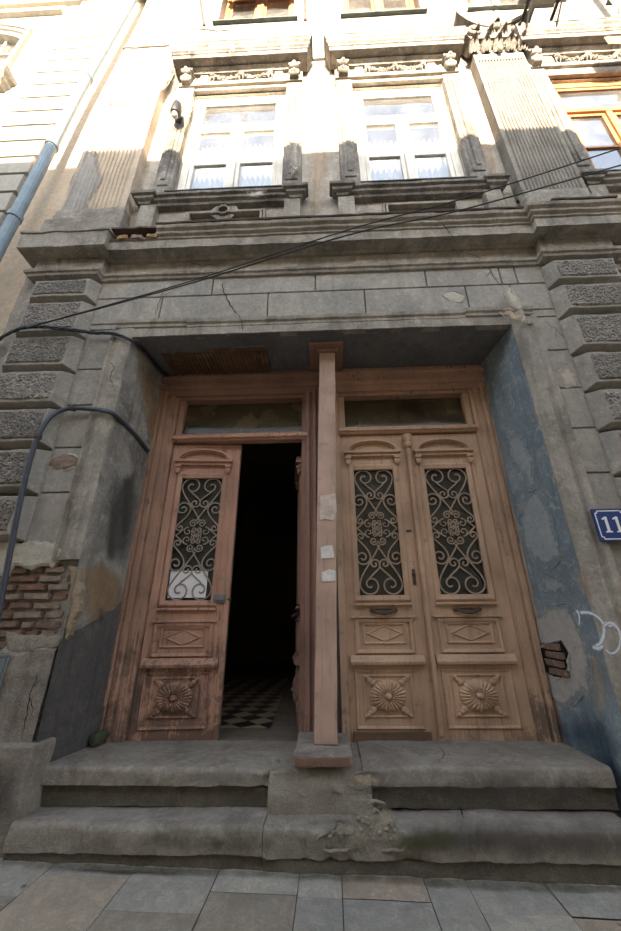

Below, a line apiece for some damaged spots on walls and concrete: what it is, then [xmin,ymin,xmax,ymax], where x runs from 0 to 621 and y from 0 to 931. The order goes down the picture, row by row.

peeling [109,49,175,106]
peeling [62,145,103,215]
crack [193,263,243,331]
spalling [0,452,29,484]
spalling [48,453,79,472]
spalling [0,541,86,653]
peeling [505,435,593,708]
crack [21,674,38,736]
spalling [313,799,406,854]